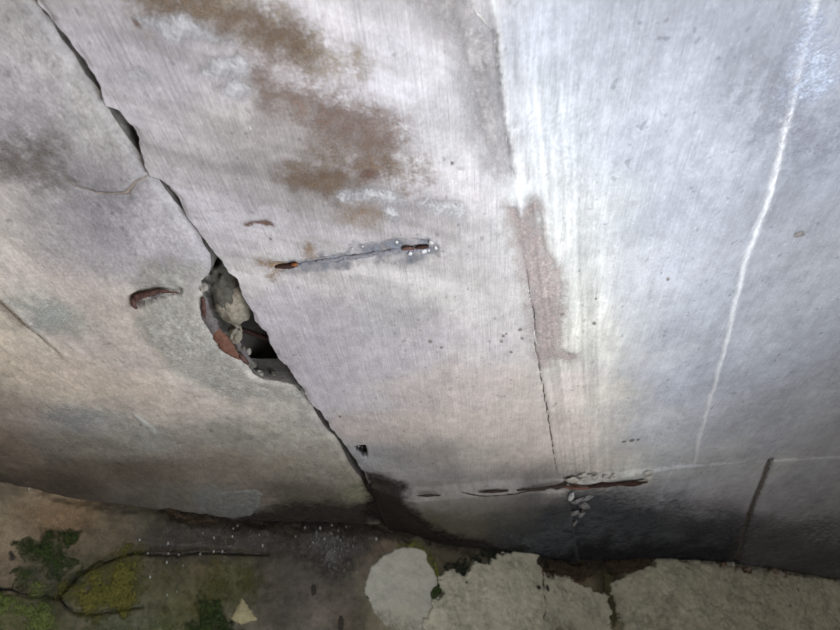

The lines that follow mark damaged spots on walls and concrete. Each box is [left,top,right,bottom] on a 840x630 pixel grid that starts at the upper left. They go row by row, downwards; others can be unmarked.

crack [36,0,370,487]
spalling [129,258,305,399]
corrosion [462,479,648,497]
spalling [565,472,616,527]
crack [734,458,773,561]
crack [0,552,213,615]